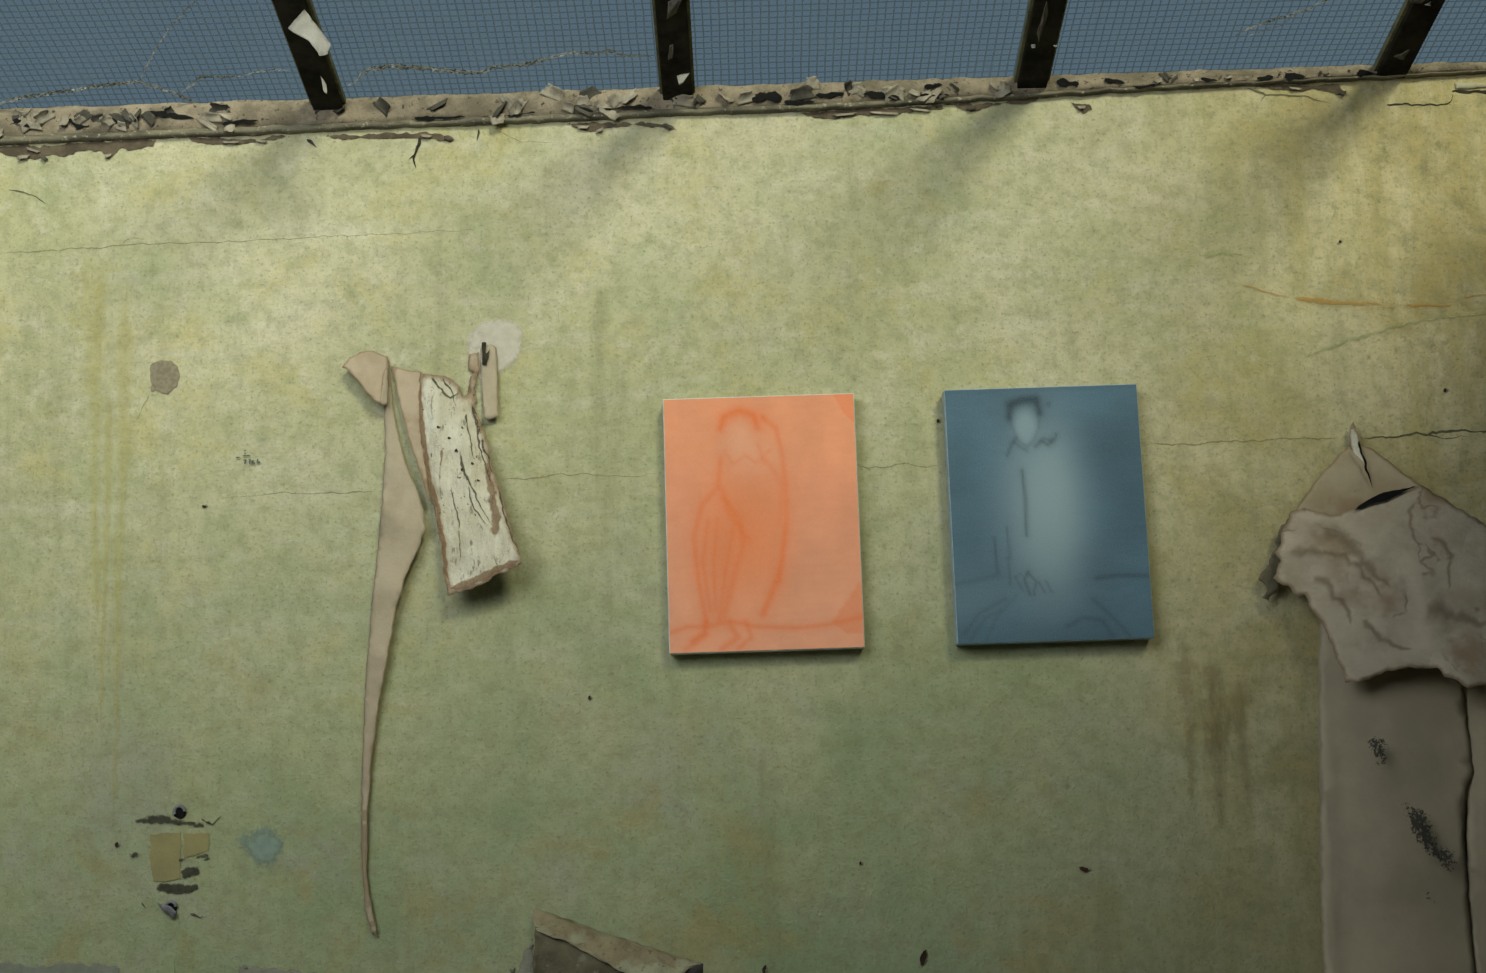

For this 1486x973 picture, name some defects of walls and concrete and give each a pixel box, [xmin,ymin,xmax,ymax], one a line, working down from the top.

flaking render [489,44,1040,132]
peeling [1056,78,1092,113]
flaking render [1104,69,1378,95]
crack [1387,82,1486,106]
flaking render [0,102,285,161]
corrosion [1244,285,1382,305]
peeling [482,342,490,365]
peeling [150,360,180,394]
crack [1366,429,1486,439]
spalling [135,815,210,827]
spalling [156,854,208,894]
peeling [0,961,119,973]